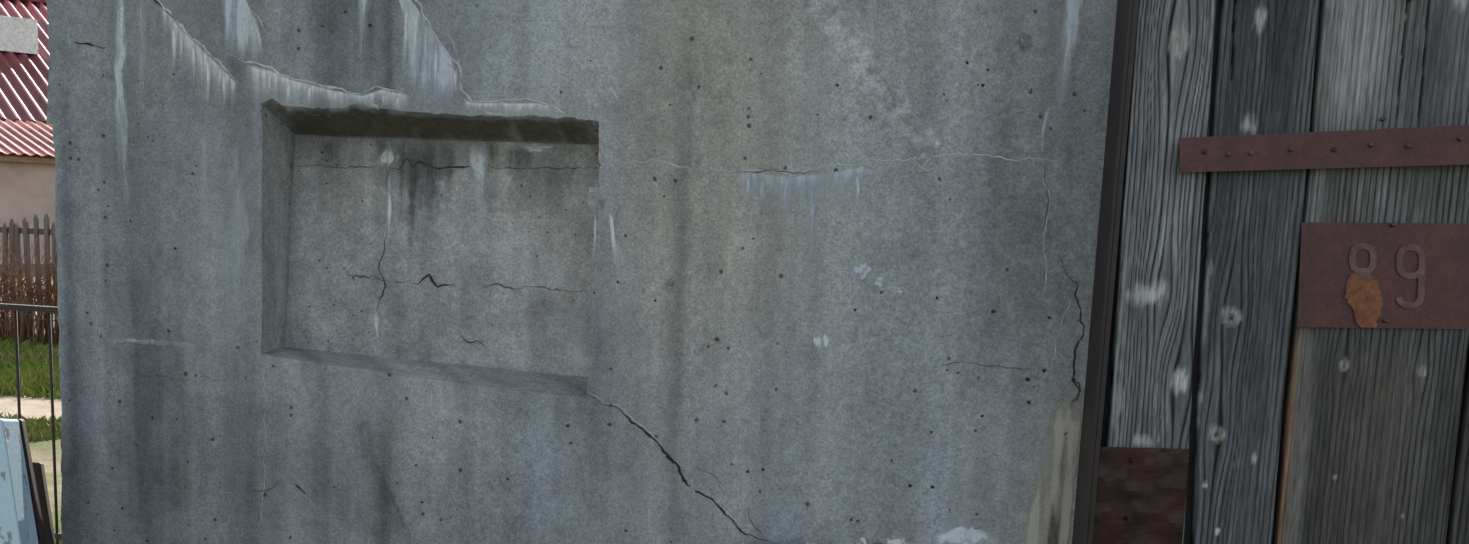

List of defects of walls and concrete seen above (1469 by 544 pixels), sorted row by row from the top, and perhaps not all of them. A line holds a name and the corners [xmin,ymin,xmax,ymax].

leakage [114,0,143,172]
leakage [163,10,236,94]
crack [154,0,403,110]
leakage [224,0,585,228]
crack [414,0,618,117]
crack [295,158,593,336]
leakage [741,166,864,234]
crack [632,152,1084,435]
crack [585,392,779,544]